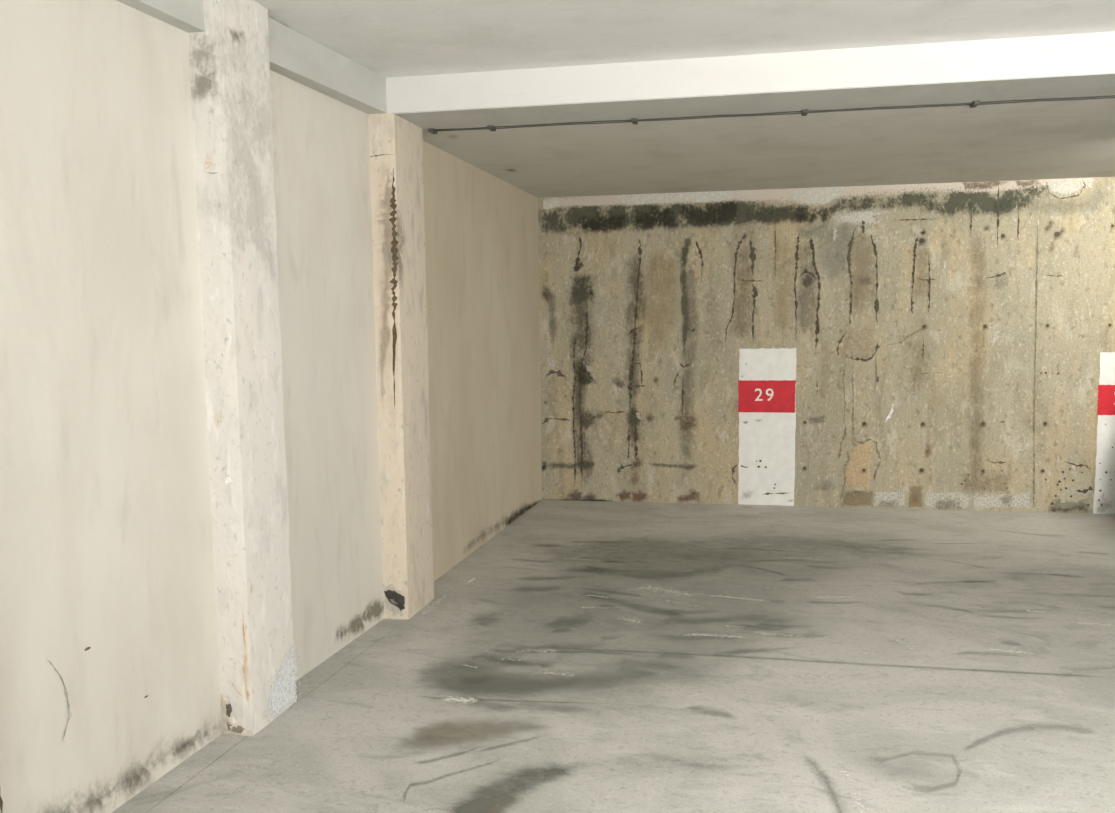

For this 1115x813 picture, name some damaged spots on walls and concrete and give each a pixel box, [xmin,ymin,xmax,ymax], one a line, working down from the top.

damp [542,179,1086,246]
damp [543,288,595,384]
damp [542,410,651,428]
damp [542,462,593,470]
spalling [838,425,881,502]
damp [844,491,872,505]
damp [909,487,922,507]